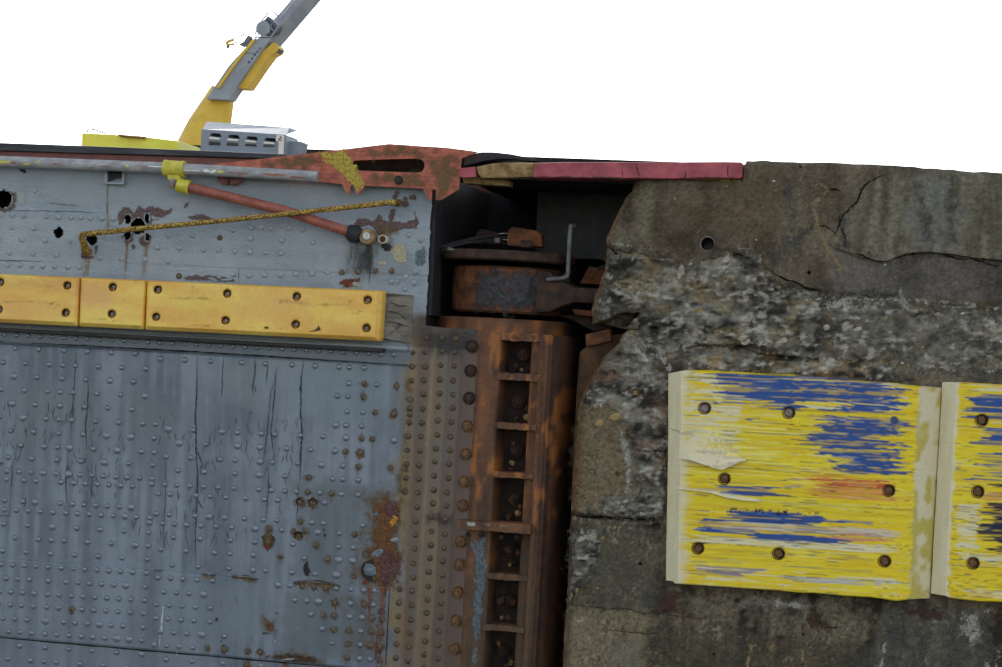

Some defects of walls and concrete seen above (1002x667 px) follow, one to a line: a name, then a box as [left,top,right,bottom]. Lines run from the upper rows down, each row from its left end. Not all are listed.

crack [819,174,1000,267]
crack [769,270,822,292]
spalling [566,247,1002,601]
rust [351,408,411,667]
rust [243,648,321,667]